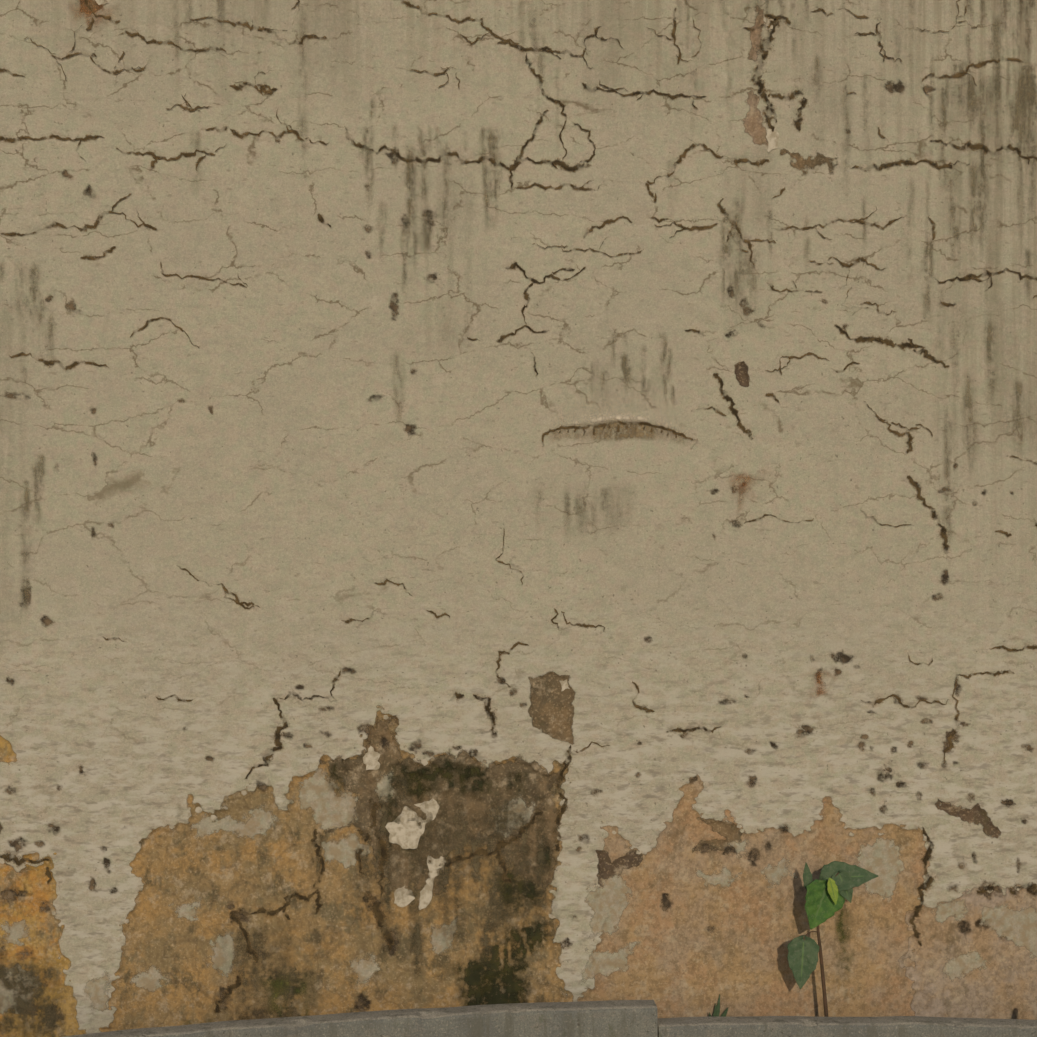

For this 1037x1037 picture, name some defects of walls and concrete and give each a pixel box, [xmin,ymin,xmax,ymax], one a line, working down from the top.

crack [0,0,706,190]
spalling [748,5,774,61]
crack [744,8,902,132]
crack [852,127,1037,171]
crack [1,193,157,260]
crack [467,144,949,402]
crack [707,373,753,439]
crack [864,401,949,550]
crack [245,671,341,779]
spalling [497,672,575,745]
crack [861,645,1037,764]
peeling [0,706,1037,1037]